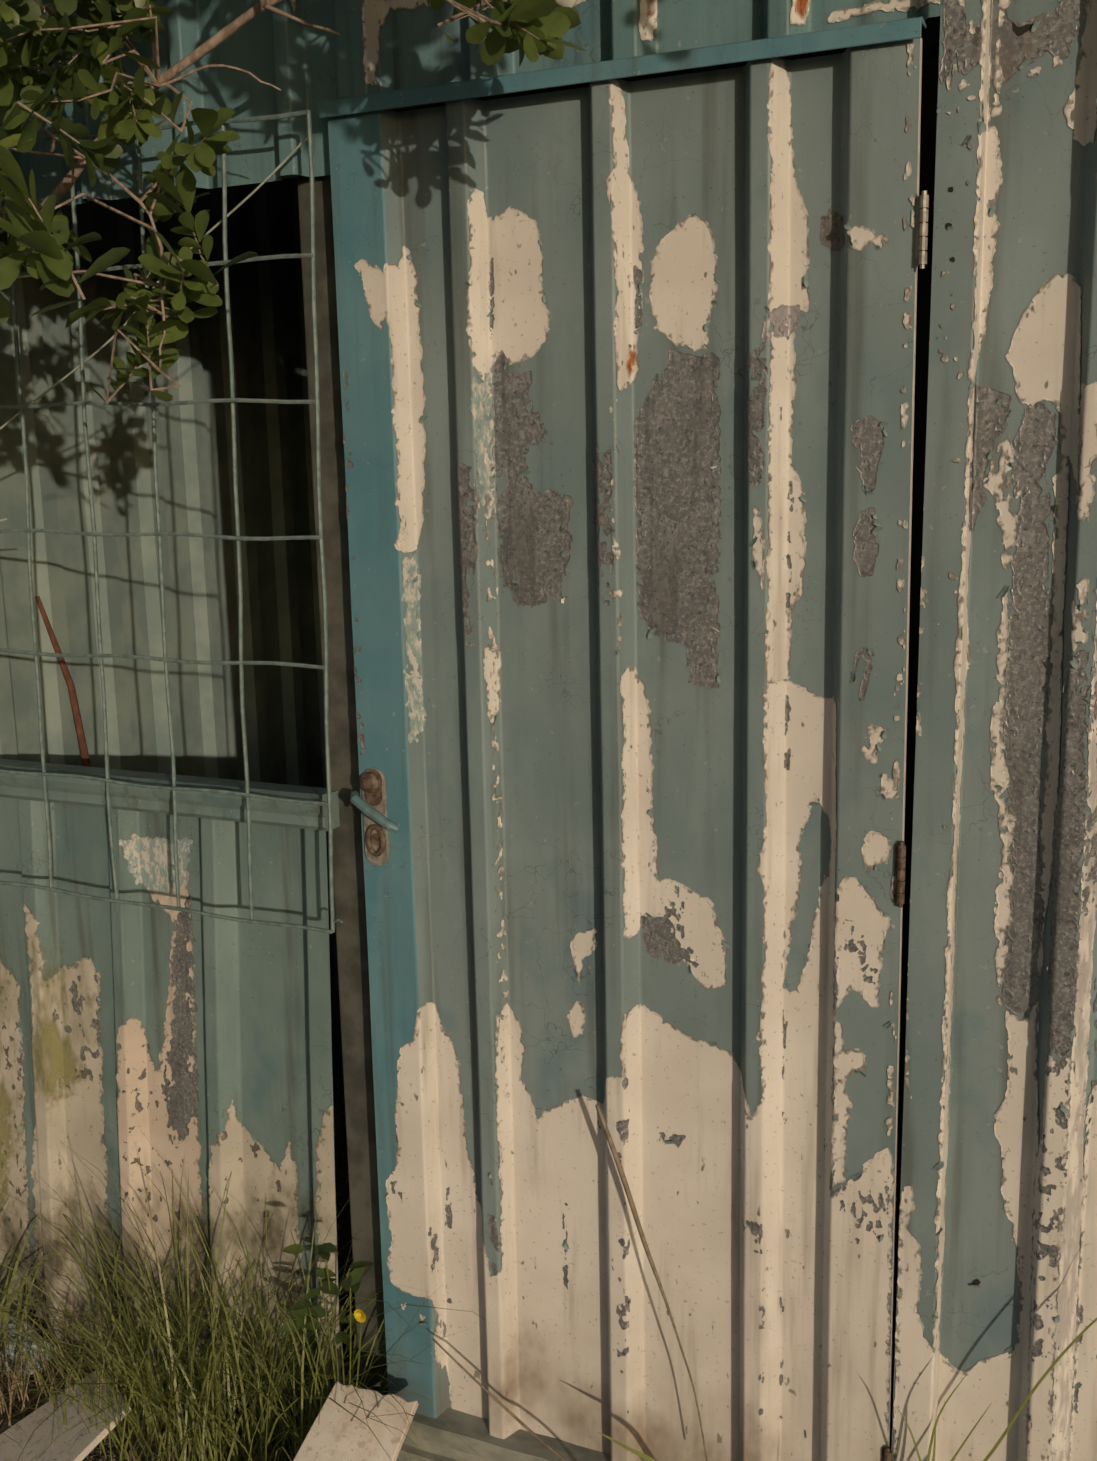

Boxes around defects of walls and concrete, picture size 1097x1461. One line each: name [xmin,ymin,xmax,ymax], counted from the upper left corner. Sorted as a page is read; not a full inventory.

peeling [362,0,431,85]
corrosion [796,0,808,17]
peeling [354,246,427,743]
peeling [383,0,1097,1461]
peeling [0,833,341,1386]